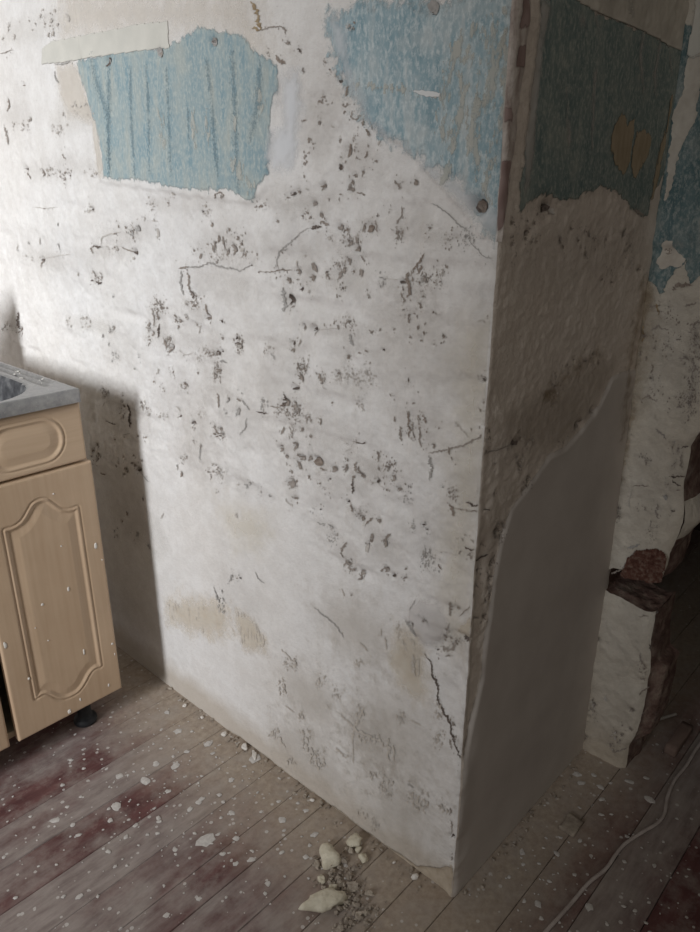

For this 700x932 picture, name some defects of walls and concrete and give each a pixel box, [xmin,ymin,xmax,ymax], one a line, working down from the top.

peeling [51,26,285,273]
peeling [280,0,700,426]
spalling [613,428,688,584]
leakage [237,612,265,647]
crack [425,655,460,757]